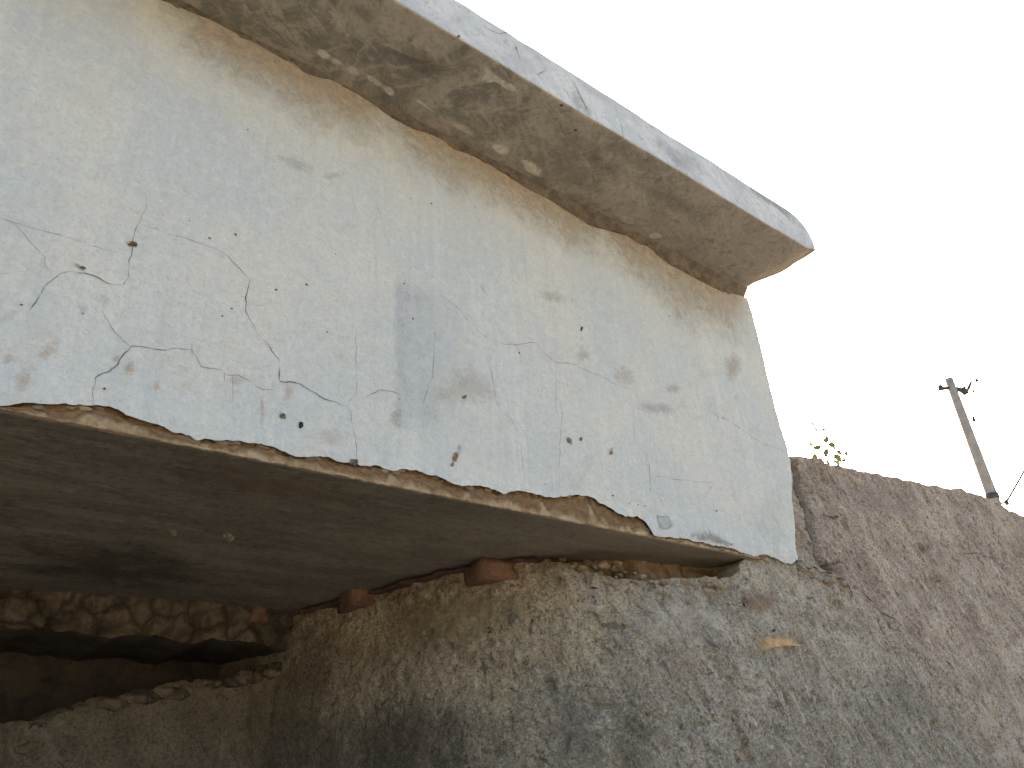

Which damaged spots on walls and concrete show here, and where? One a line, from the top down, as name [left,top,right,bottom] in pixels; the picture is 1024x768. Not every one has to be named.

crack [54,227,137,284]
crack [92,346,207,400]
crack [238,347,344,406]
spalling [0,403,769,591]